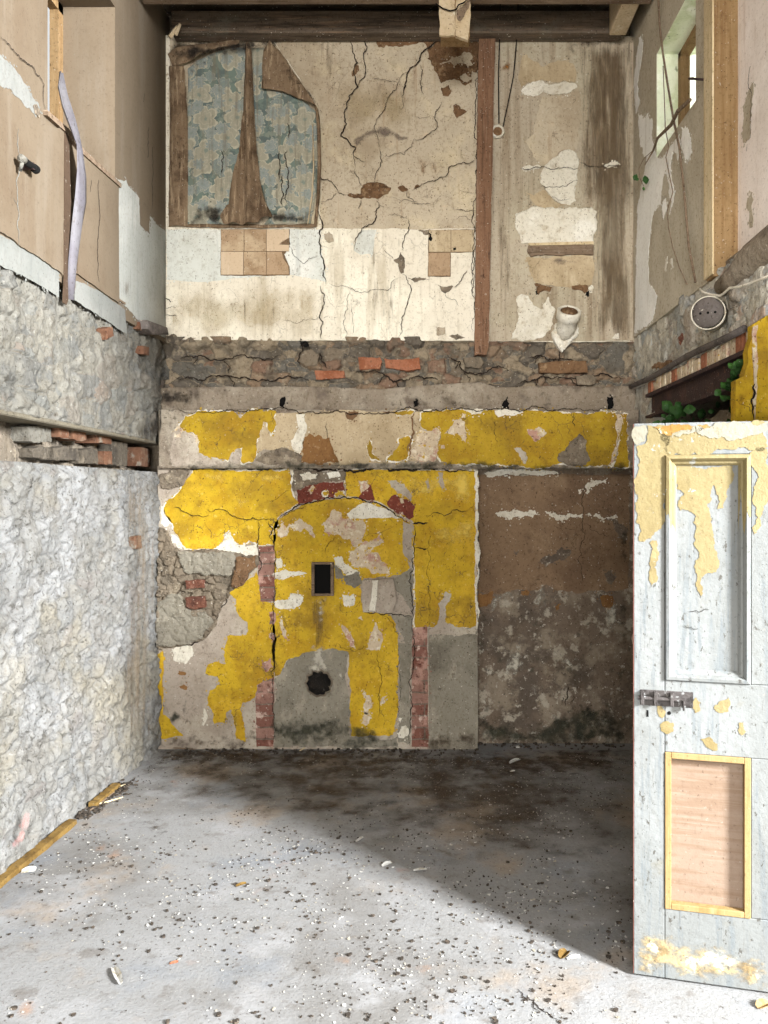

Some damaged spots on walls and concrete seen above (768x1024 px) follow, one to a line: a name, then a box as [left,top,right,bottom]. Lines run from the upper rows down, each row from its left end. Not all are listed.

peeling [0,54,42,117]
peeling [166,37,478,243]
crack [288,42,478,367]
peeling [524,188,570,208]
peeling [521,80,584,173]
peeling [525,253,597,295]
water stain [598,54,626,330]
peeling [633,34,692,333]
crack [175,491,474,740]
peeling [127,407,633,749]
water stain [482,708,625,744]